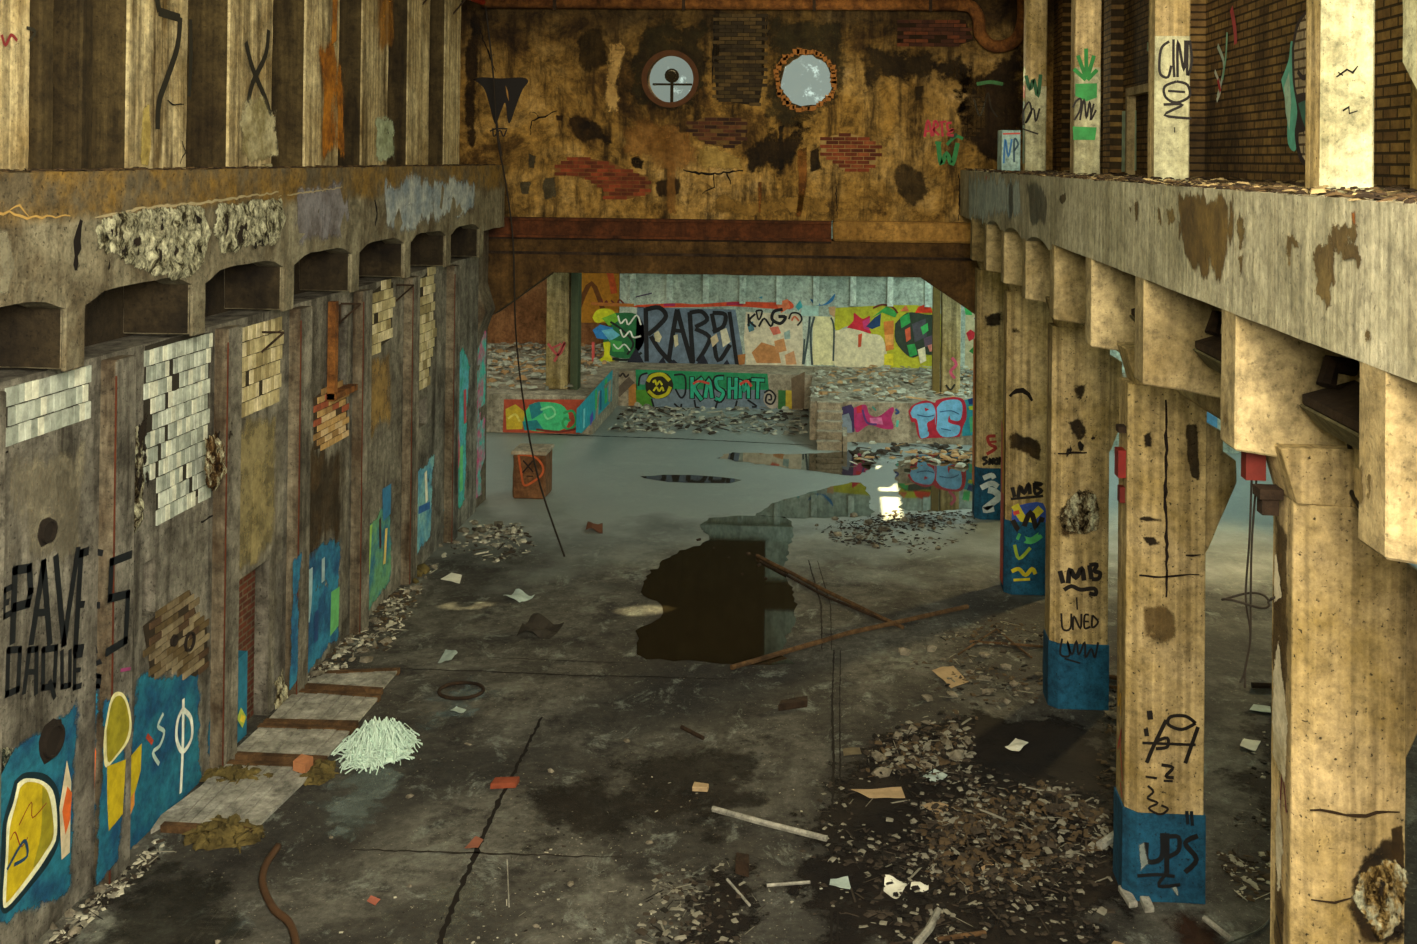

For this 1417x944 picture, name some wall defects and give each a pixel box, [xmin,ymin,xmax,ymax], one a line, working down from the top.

flaking render [686,14,768,148]
flaking render [554,157,652,200]
flaking render [820,133,882,172]
spalling [96,198,286,281]
peeling [1236,218,1245,275]
peeling [1286,222,1361,311]
spalling [1066,430,1095,456]
spalling [1060,490,1100,534]
crack [400,657,726,679]
crack [351,717,623,944]
spalling [1353,859,1409,941]